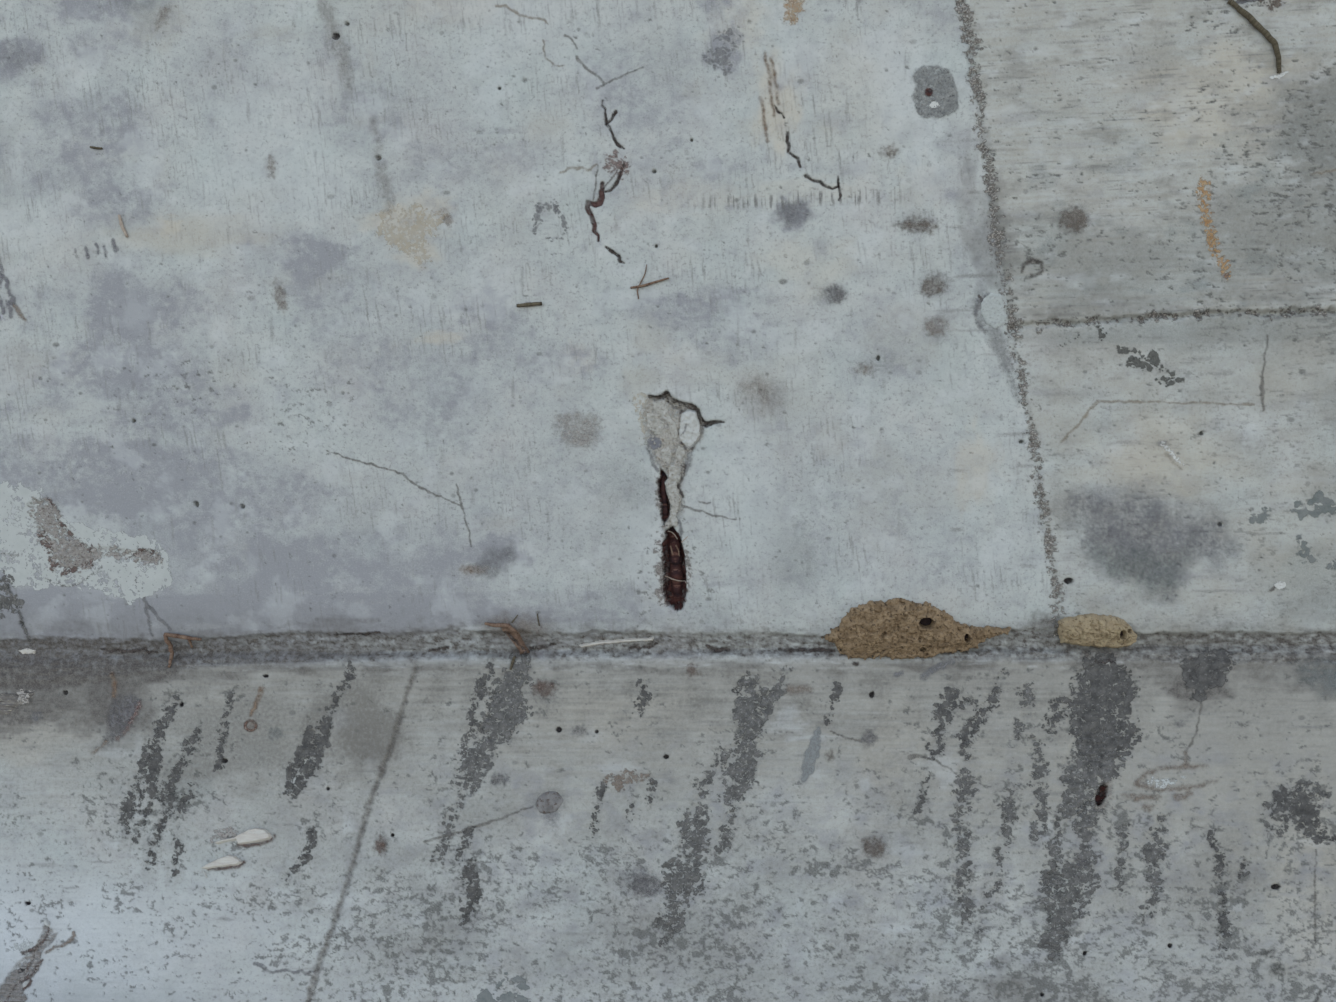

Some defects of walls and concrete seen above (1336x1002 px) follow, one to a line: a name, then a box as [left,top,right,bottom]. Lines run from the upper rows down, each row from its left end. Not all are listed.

rust [784,0,804,24]
crack [498,5,635,263]
crack [775,107,842,201]
rust [1195,178,1231,280]
peeling [0,480,172,619]
crack [327,450,471,545]
spalling [645,391,724,610]